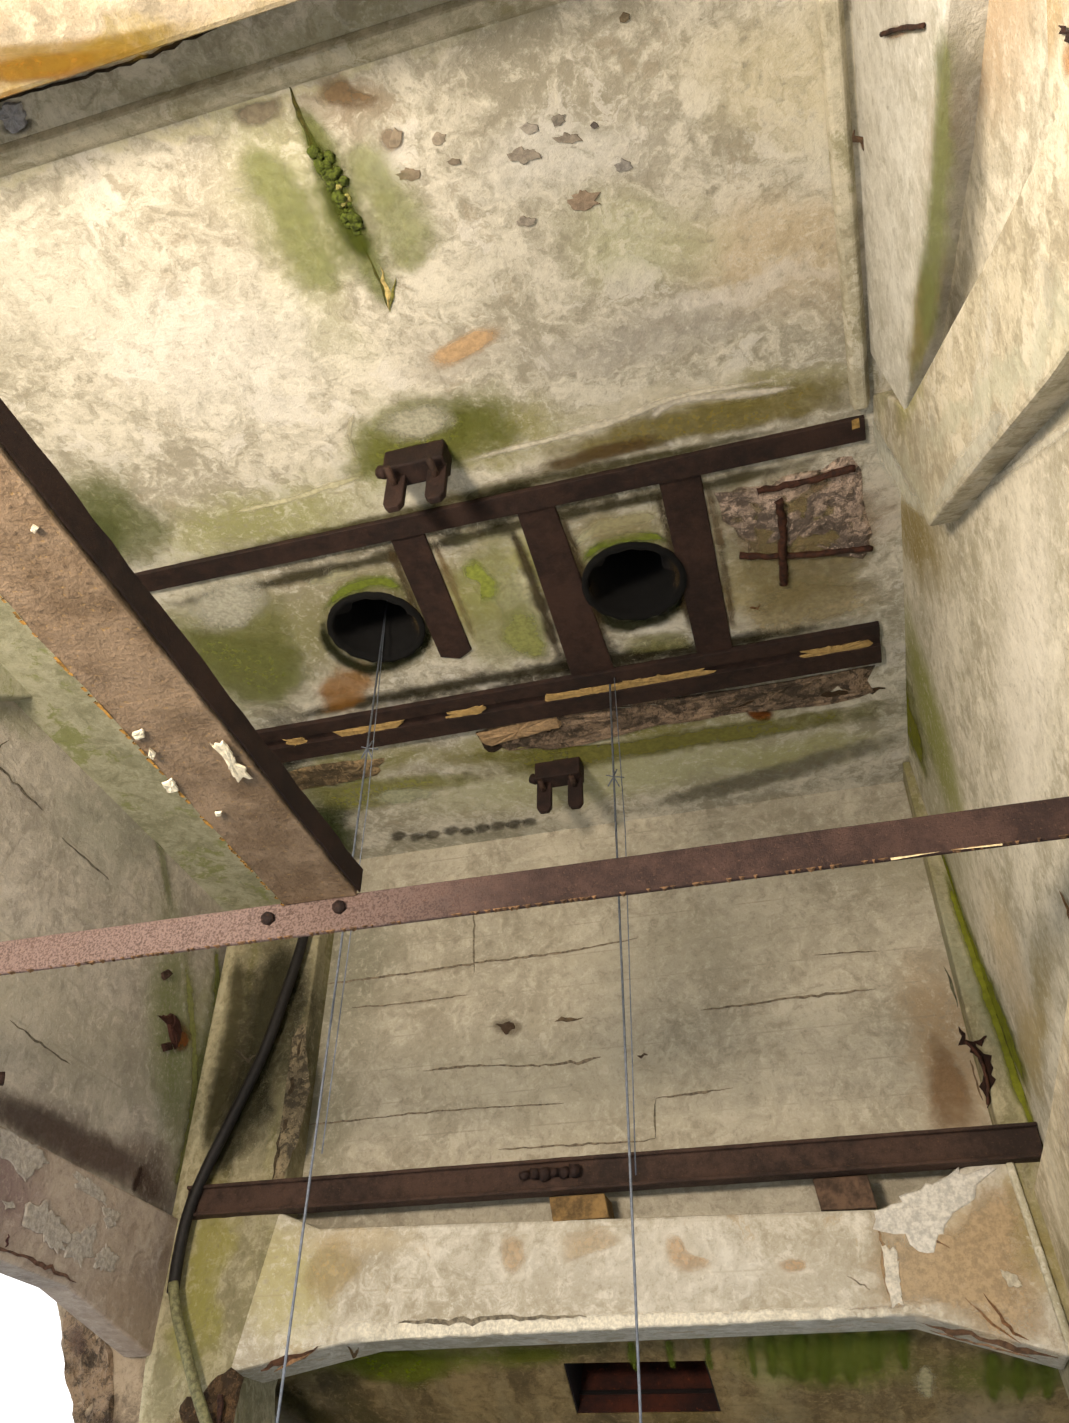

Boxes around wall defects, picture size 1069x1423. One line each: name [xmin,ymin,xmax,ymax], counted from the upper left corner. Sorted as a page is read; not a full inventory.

crack [0,28,217,102]
crack [248,87,423,311]
mould [79,496,163,555]
spalling [714,456,873,629]
crack [703,988,876,1010]
damp [205,952,303,1175]
crack [498,1088,730,1150]
peeling [0,1128,50,1182]
peeling [348,1166,1037,1343]
crack [922,1323,1058,1359]
spalling [169,1367,244,1423]
damp [919,1368,933,1397]